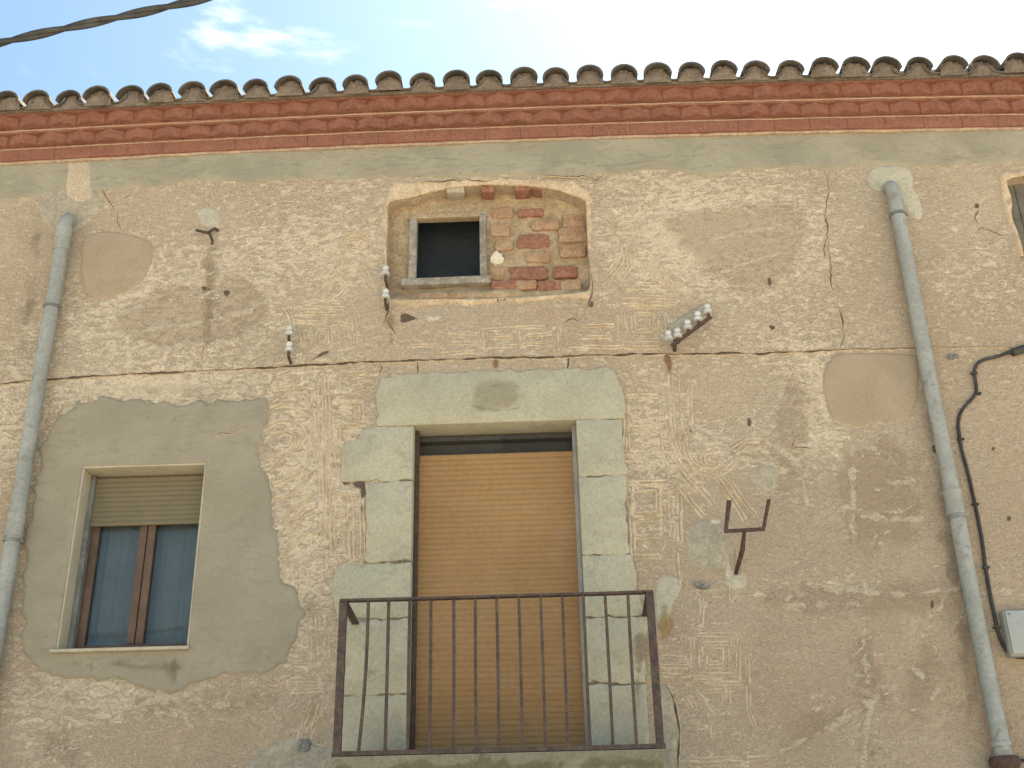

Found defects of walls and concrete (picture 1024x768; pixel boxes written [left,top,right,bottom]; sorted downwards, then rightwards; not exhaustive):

crack [0,168,1011,386]